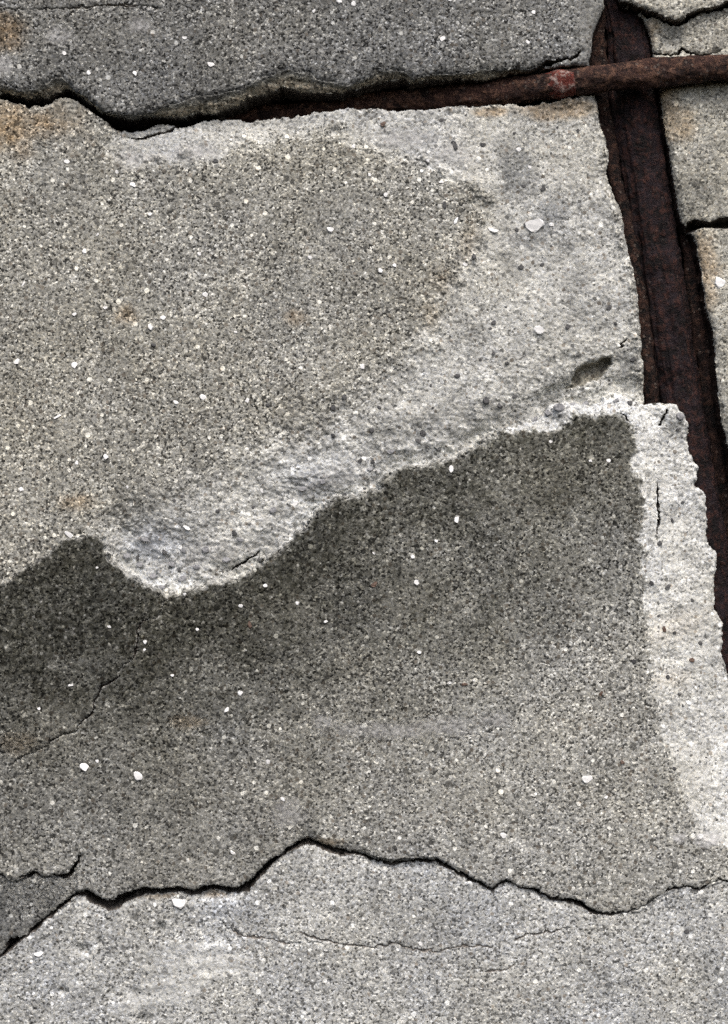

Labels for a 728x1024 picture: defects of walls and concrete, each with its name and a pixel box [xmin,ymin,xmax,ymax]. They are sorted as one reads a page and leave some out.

crack [0,51,591,140]
water stain [0,416,635,709]
crack [0,838,639,958]
crack [665,878,728,892]